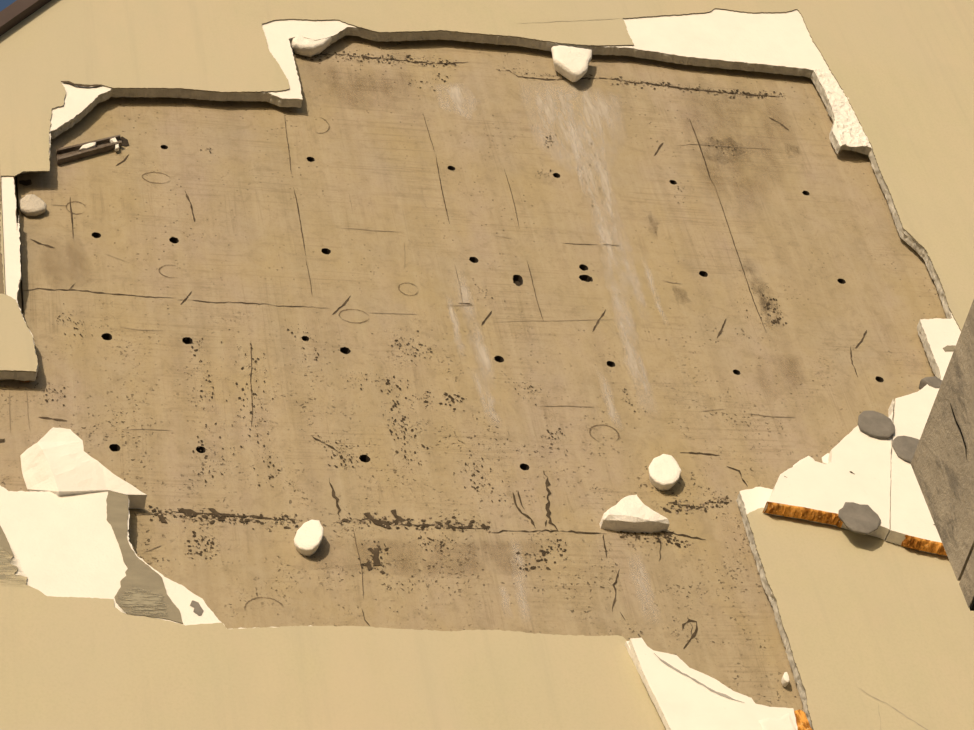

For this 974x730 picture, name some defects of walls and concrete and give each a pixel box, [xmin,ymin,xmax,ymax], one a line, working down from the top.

spalling [305,51,457,91]
spalling [815,68,869,147]
spalling [187,338,281,487]
spalling [347,371,465,468]
spalling [663,496,732,514]
flaking render [0,526,18,579]
spalling [149,504,303,560]
spalling [358,541,390,574]
spalling [338,509,491,551]
spalling [516,532,567,577]
spalling [617,531,690,550]
spalling [190,600,203,616]